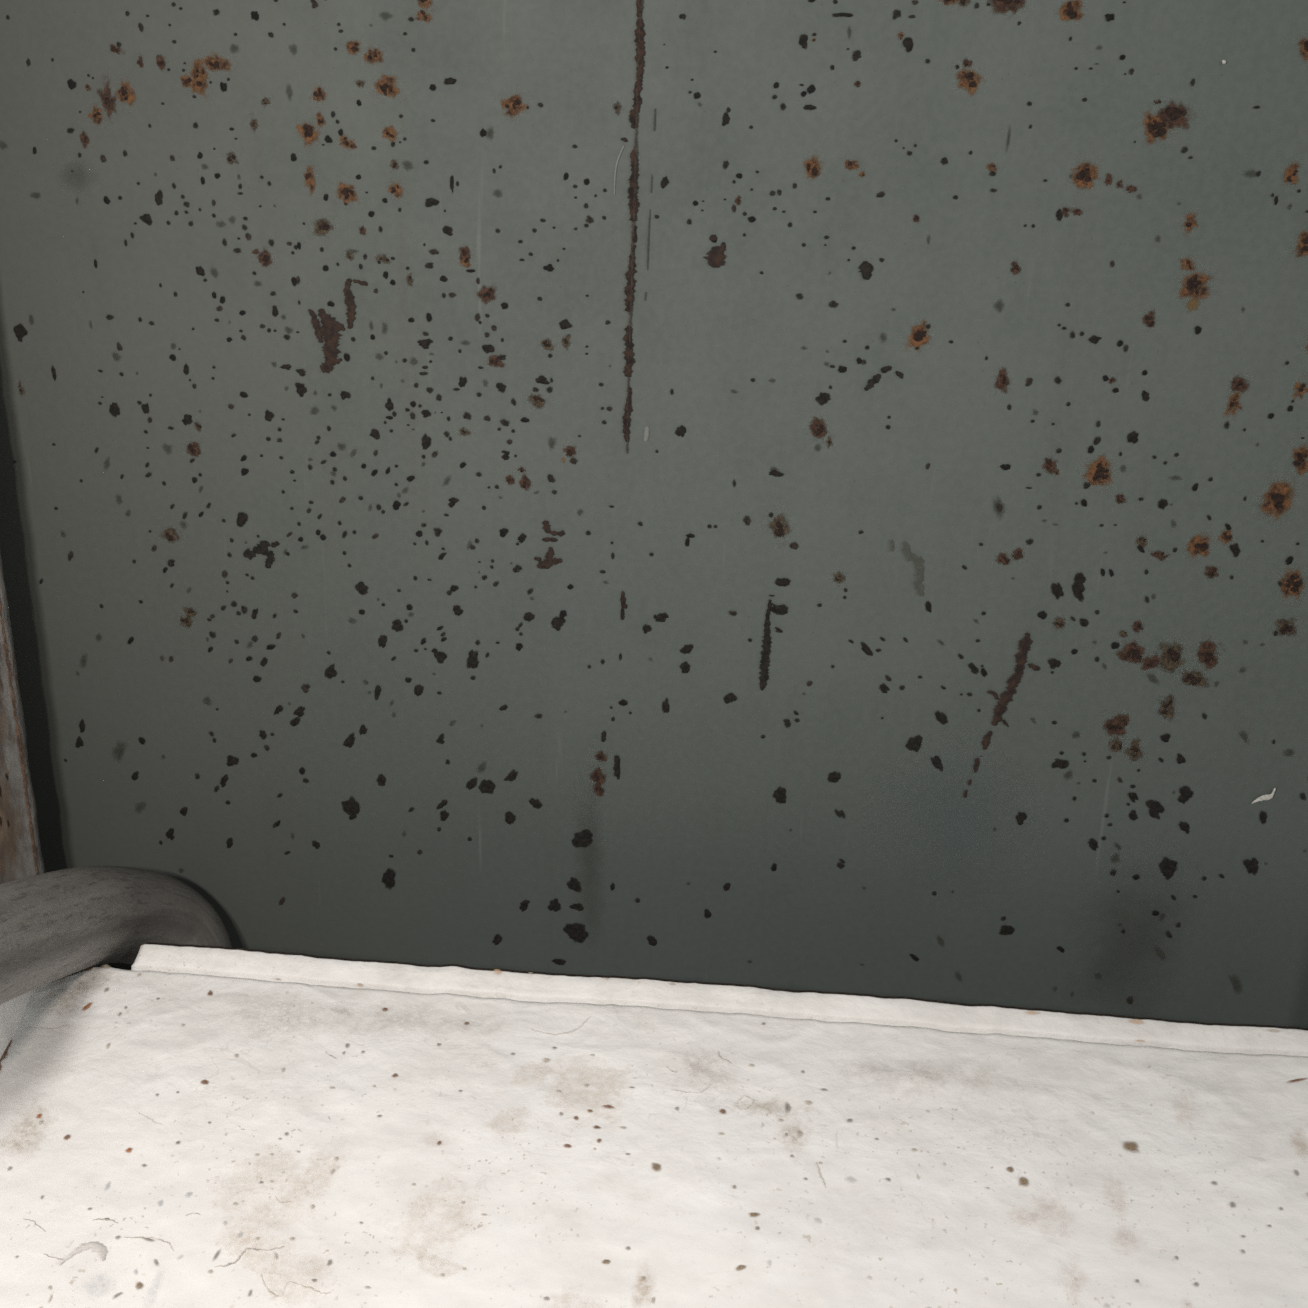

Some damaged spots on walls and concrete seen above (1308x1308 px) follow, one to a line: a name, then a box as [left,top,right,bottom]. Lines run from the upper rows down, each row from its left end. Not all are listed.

corrosion [1144,99,1188,144]
corrosion [613,0,645,453]
peeling [196,266,300,342]
corrosion [308,278,367,373]
peeling [228,176,566,696]
peeling [98,393,298,682]
corrosion [759,599,787,690]
peeling [1037,552,1119,674]
corrosion [1117,621,1217,686]
peeling [195,651,344,804]
corrosion [963,633,1040,798]
peeling [520,877,588,943]